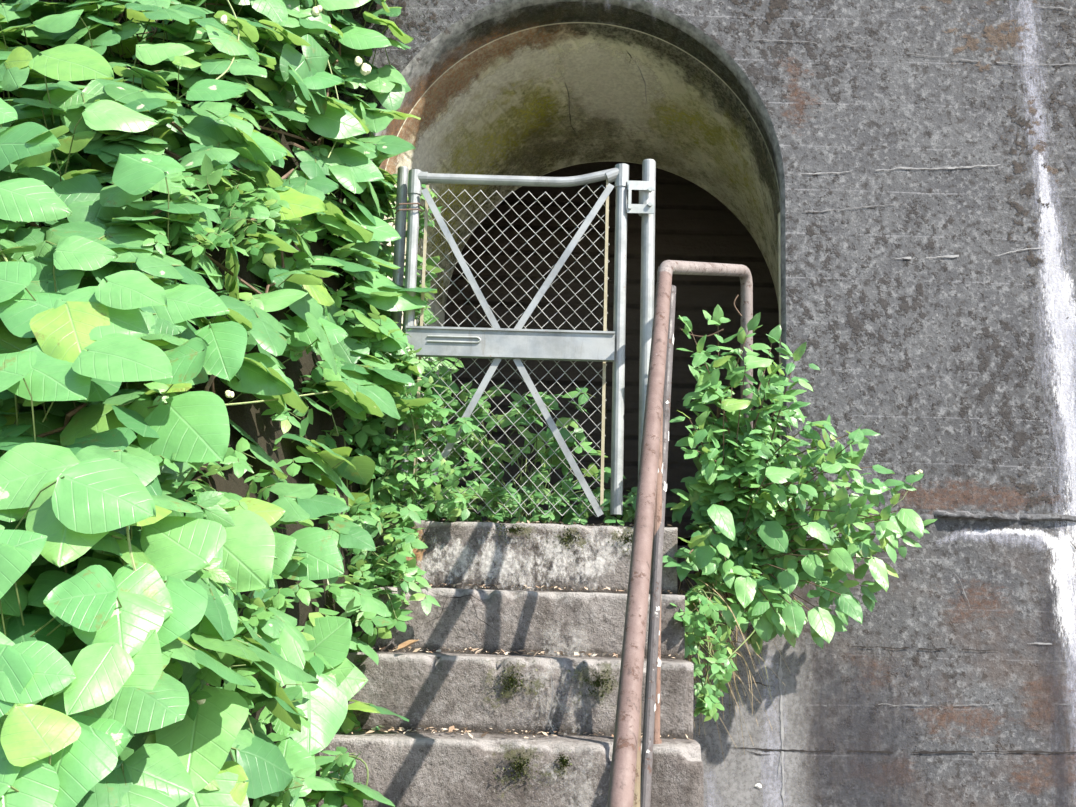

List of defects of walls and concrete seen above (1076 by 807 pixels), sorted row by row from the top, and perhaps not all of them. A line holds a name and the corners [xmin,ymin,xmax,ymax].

leakage [424,89,562,308]
leakage [945,1,1076,693]
crack [730,654,1076,807]